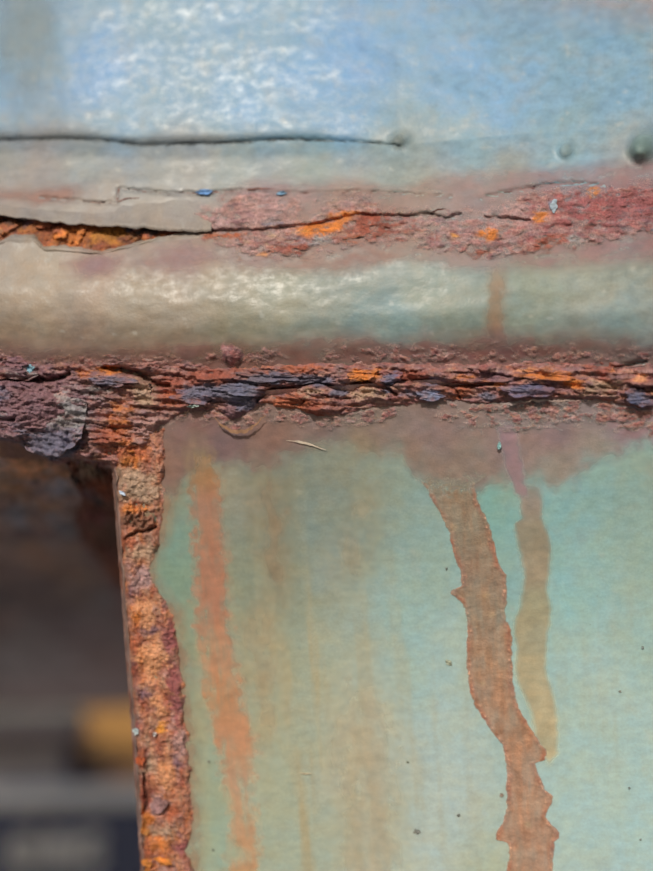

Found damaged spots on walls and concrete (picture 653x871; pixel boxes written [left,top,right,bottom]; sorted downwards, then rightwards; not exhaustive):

crack [0,138,386,147]
peeling [0,189,213,255]
corrosion [0,163,653,386]
peeling [88,375,140,387]
peeling [169,368,336,408]
peeling [347,368,403,385]
corrosion [66,392,653,871]